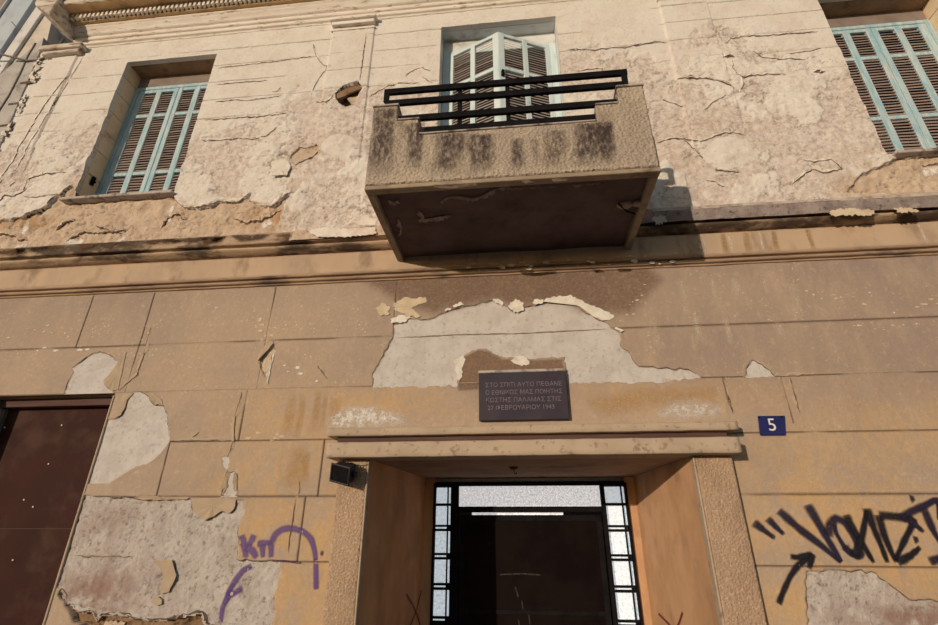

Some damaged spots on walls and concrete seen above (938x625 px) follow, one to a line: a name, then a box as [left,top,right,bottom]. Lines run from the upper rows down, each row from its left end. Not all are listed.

crack [663,31,819,110]
crack [0,60,82,220]
flaking render [0,186,290,249]
water stain [372,109,392,160]
water stain [438,134,490,169]
water stain [578,123,611,158]
crack [657,131,743,187]
flaking render [616,157,938,225]
crack [792,158,842,185]
flaking render [372,284,701,388]
flaking render [65,345,170,484]
flaking render [58,457,282,625]